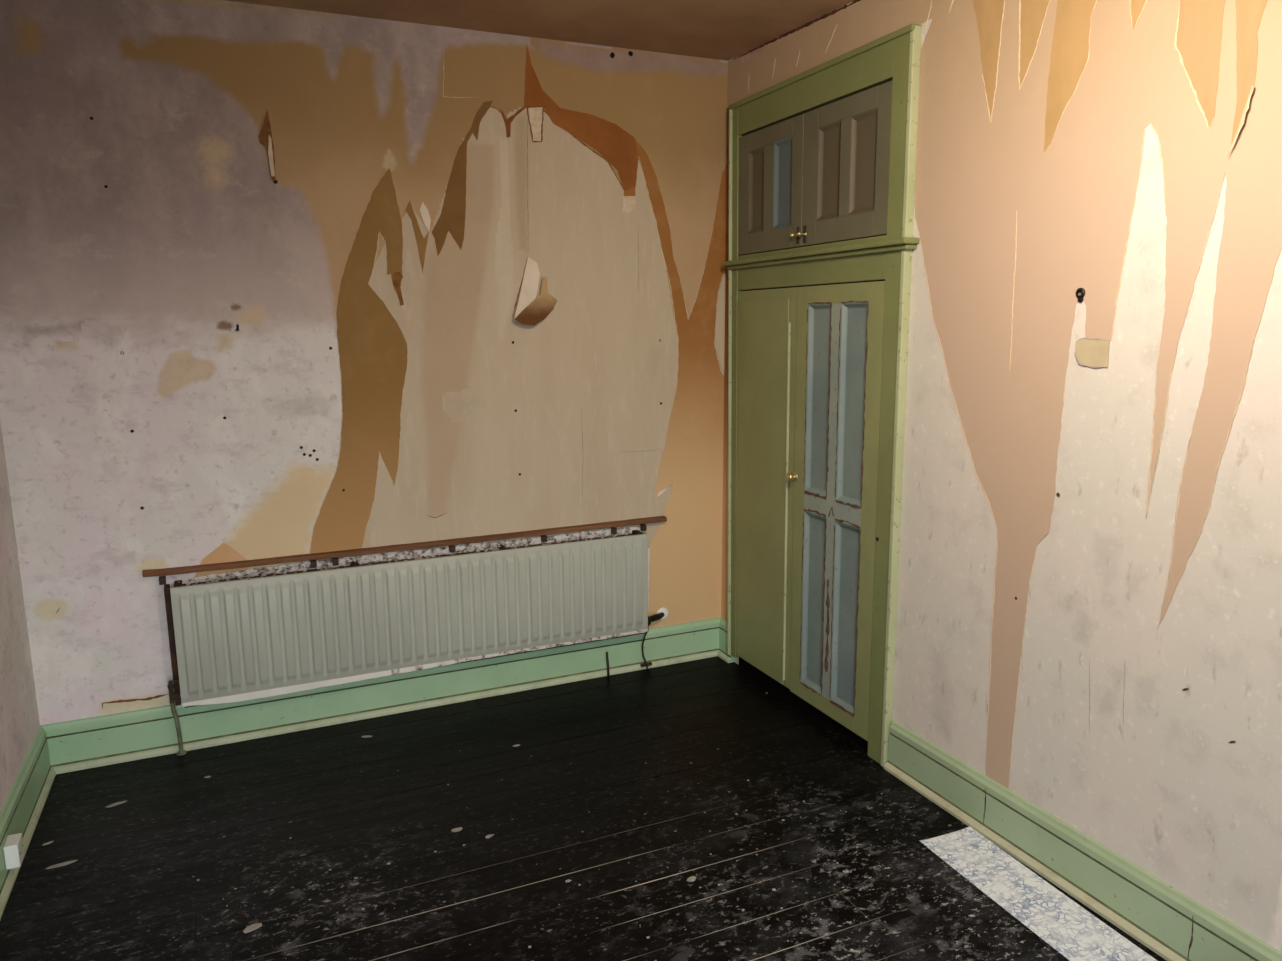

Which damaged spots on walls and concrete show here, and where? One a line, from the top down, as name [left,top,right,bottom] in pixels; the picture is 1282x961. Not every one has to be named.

peeling [973,0,1097,152]
peeling [1129,0,1148,32]
peeling [1174,0,1267,156]
peeling [182,26,803,629]